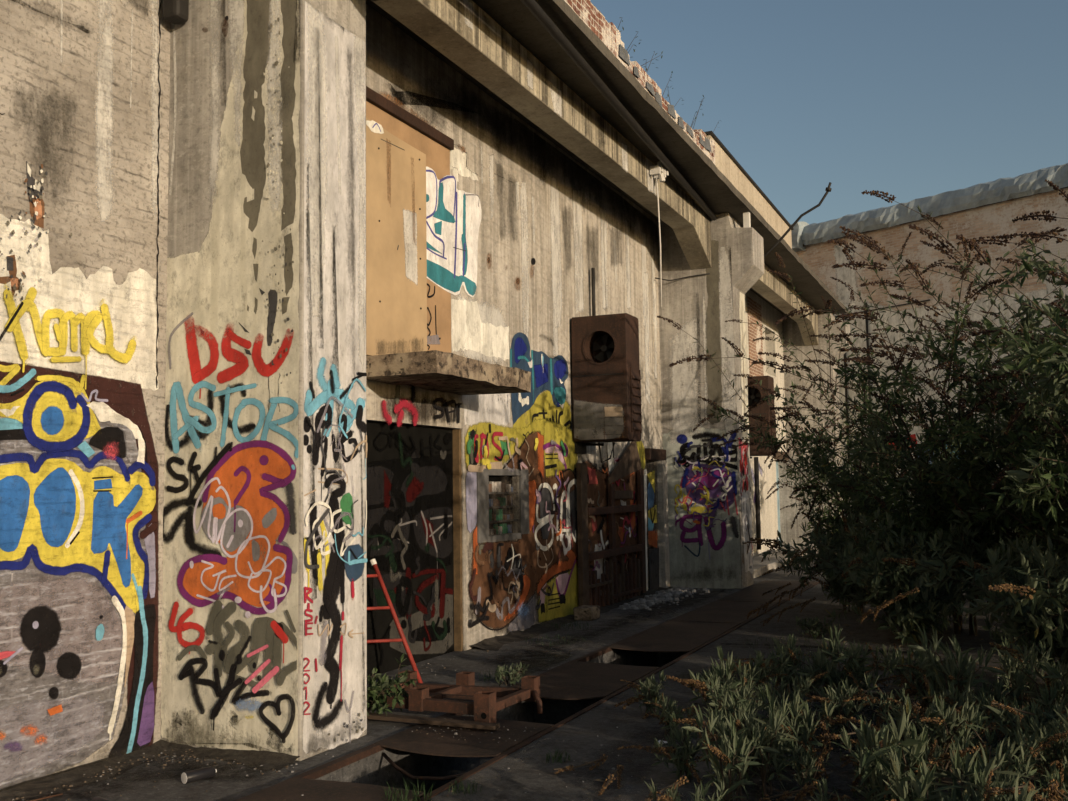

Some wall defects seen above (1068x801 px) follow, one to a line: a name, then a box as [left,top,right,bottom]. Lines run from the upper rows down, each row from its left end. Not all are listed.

water stain [464,0,487,30]
spalling [26,161,45,228]
peeling [240,0,298,346]
spalling [0,255,20,297]
water stain [391,82,658,403]